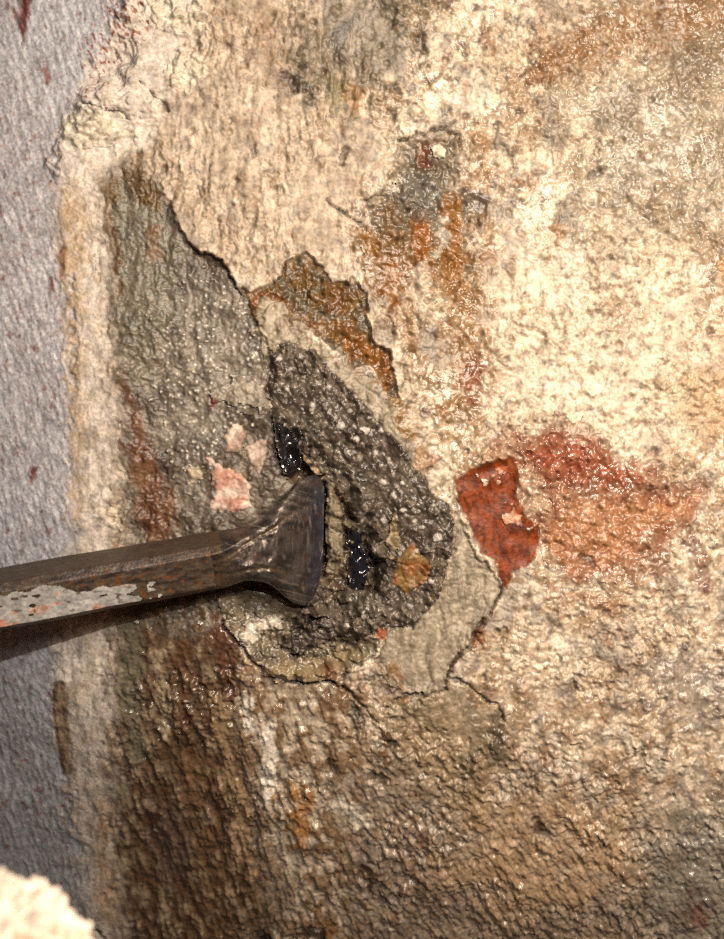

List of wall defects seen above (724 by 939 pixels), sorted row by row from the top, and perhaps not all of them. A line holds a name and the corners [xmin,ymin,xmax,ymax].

spalling [0,456,542,706]
spalling [58,105,505,549]
leakage [91,409,724,939]
corrosion [383,252,512,478]